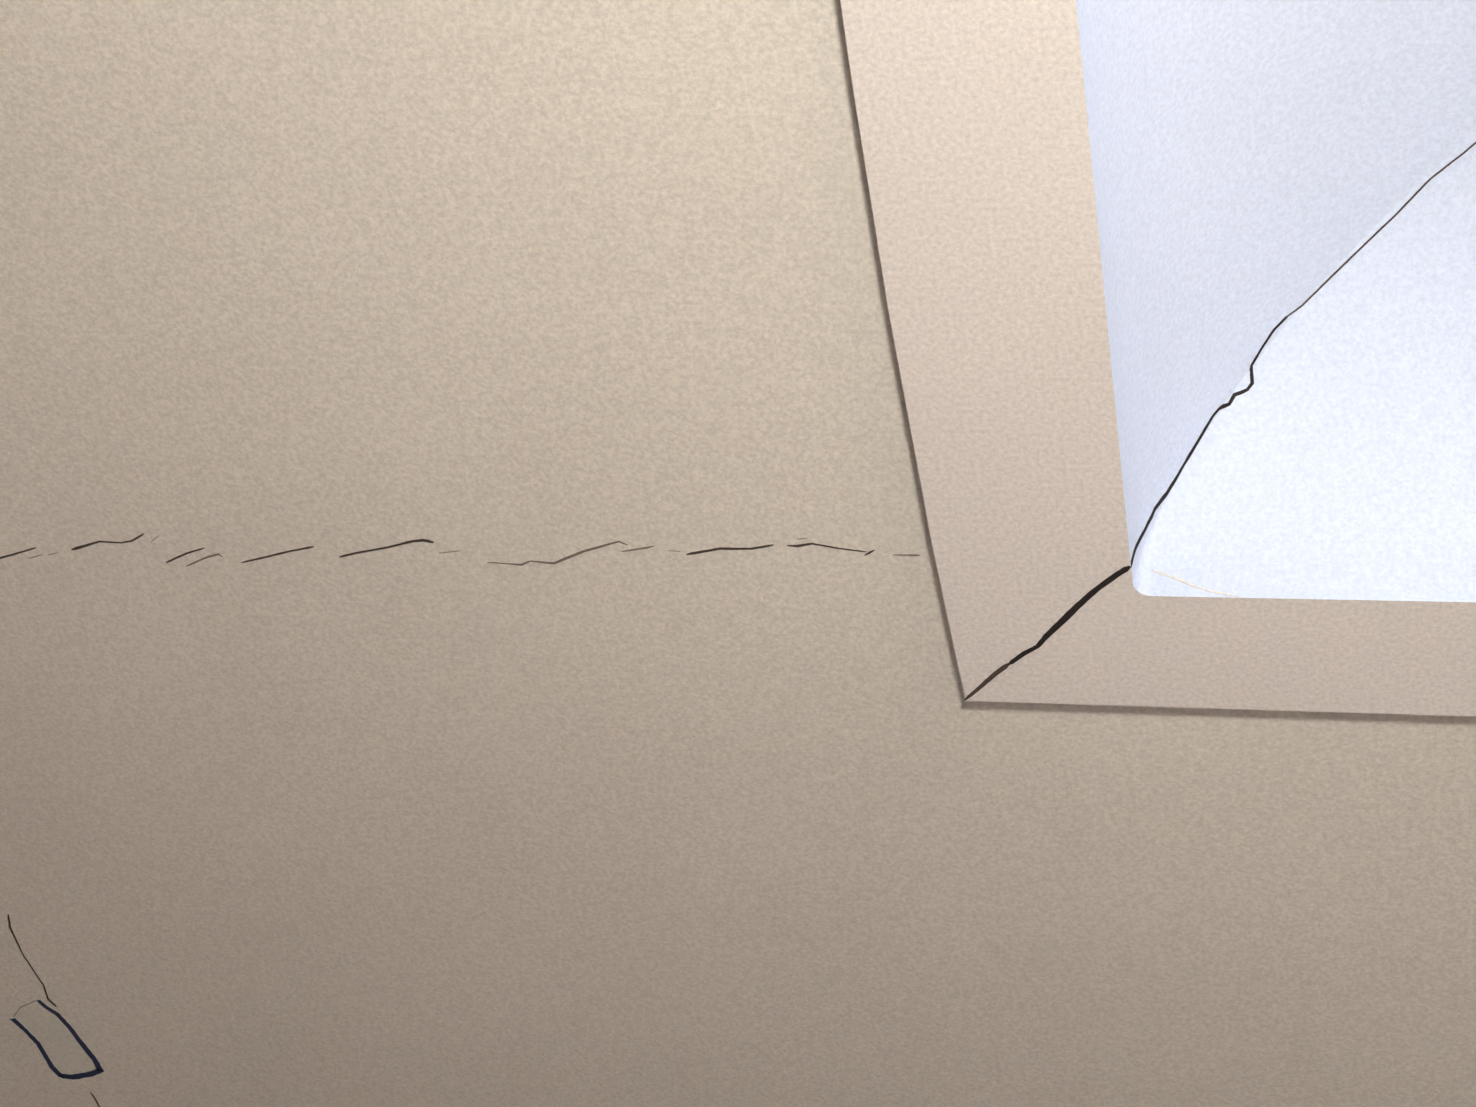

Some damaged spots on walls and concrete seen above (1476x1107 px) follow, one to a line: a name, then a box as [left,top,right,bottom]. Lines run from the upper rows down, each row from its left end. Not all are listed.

crack [964,142,1476,701]
crack [0,534,920,567]
crack [7,914,57,1007]